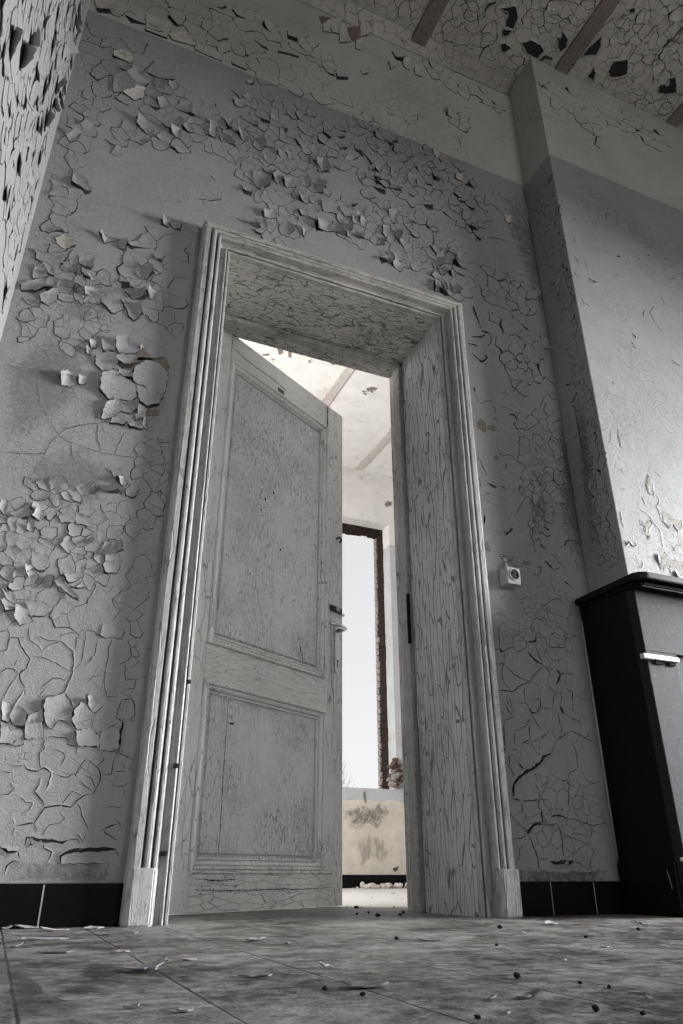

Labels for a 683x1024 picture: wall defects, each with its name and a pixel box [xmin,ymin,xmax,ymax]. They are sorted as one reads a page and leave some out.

peeling [442,0,596,78]
spalling [580,34,630,82]
spalling [656,76,678,96]
peeling [0,0,552,639]
crack [234,348,287,392]
flaking render [644,474,655,497]
flaking render [639,511,683,541]
flaking render [654,550,683,578]
crack [468,306,676,871]
peeling [0,694,120,751]
crack [0,627,139,874]
crack [194,877,329,893]